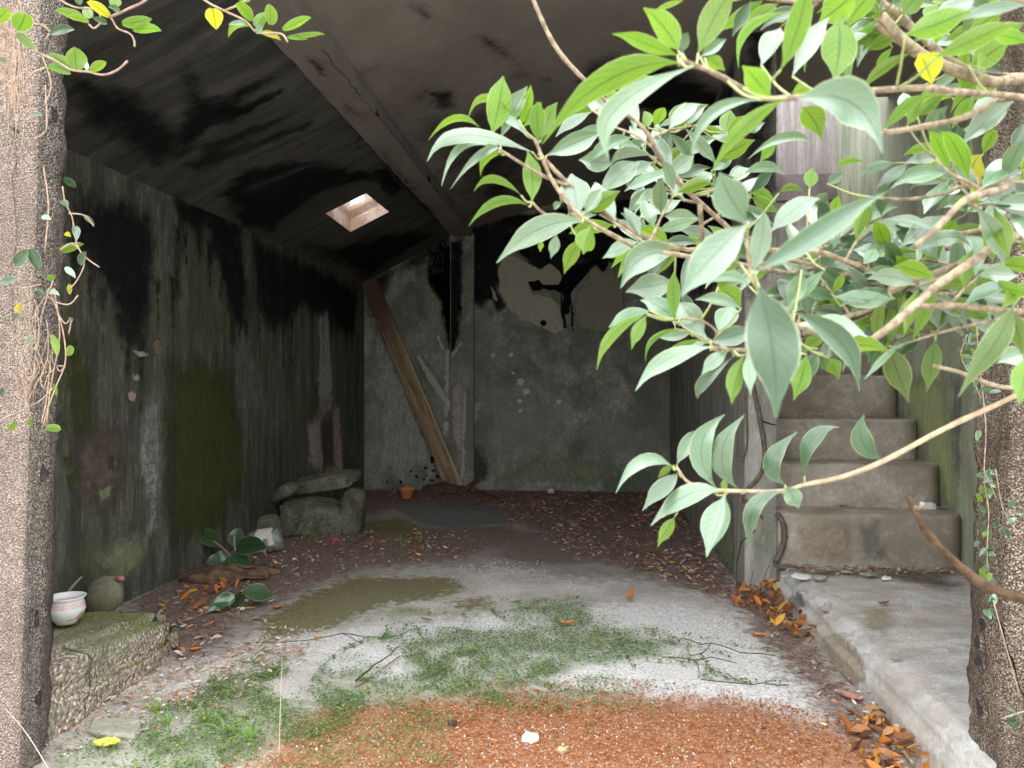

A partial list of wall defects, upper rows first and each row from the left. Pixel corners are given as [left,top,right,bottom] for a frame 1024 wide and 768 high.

damp [185,118,311,170]
damp [221,80,283,122]
crack [322,50,453,226]
damp [68,239,105,311]
flaking render [474,256,564,334]
flaking render [575,266,625,332]
damp [313,311,334,469]
damp [74,424,126,513]
damp [140,401,166,532]